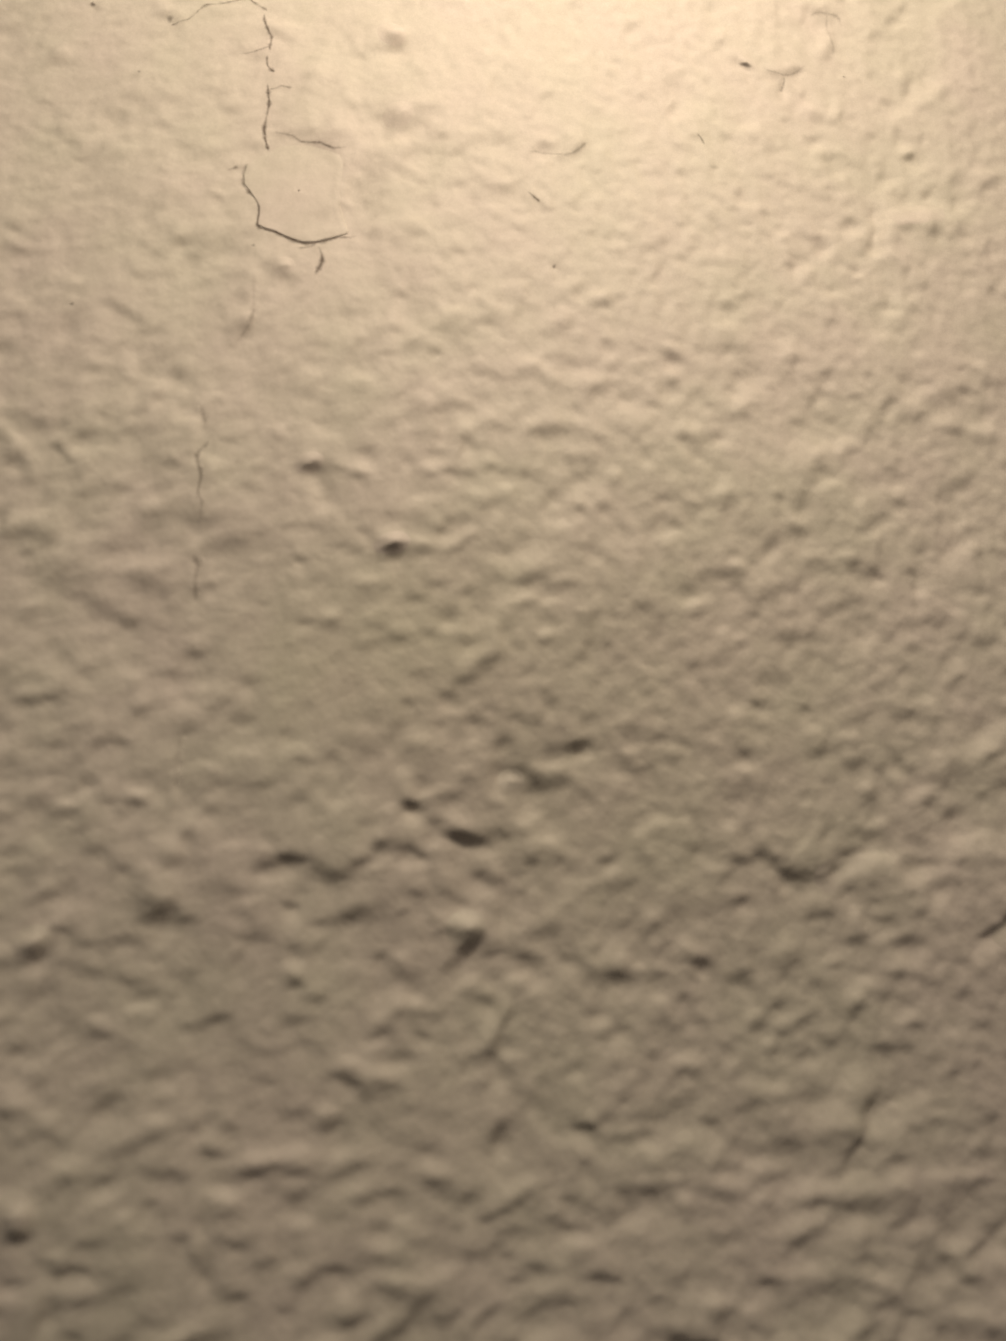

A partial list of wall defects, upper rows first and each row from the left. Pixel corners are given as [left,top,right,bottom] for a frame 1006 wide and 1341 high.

crack [248,192,336,269]